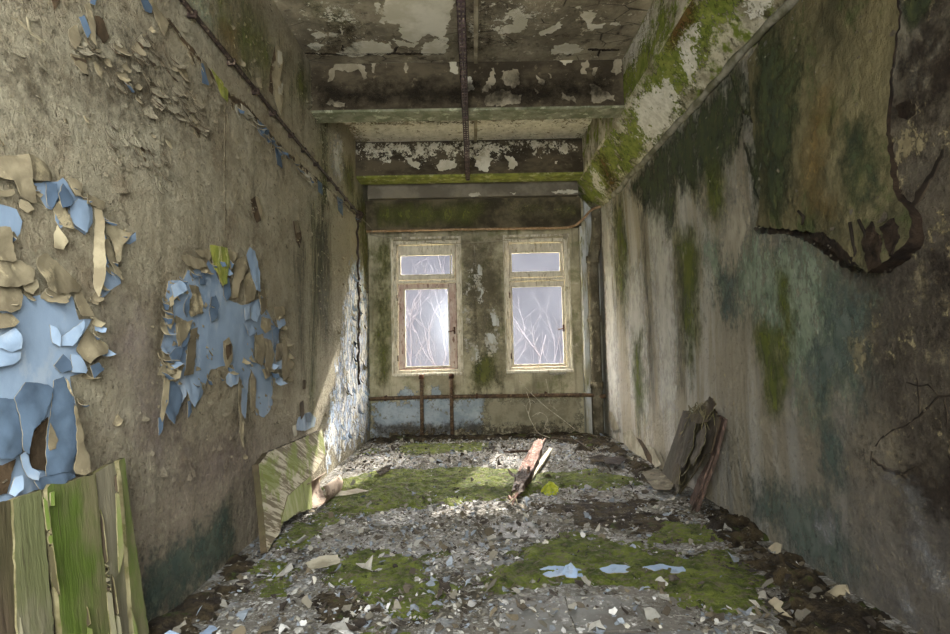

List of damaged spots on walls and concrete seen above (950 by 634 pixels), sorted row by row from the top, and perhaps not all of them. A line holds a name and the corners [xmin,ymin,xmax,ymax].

peeling [467,0,621,39]
peeling [551,42,615,103]
peeling [611,6,654,75]
damp [894,0,950,113]
crack [912,146,946,207]
peeling [0,0,592,511]
damp [464,247,500,389]
damp [601,145,874,489]
crack [870,378,950,483]
damp [748,474,868,588]